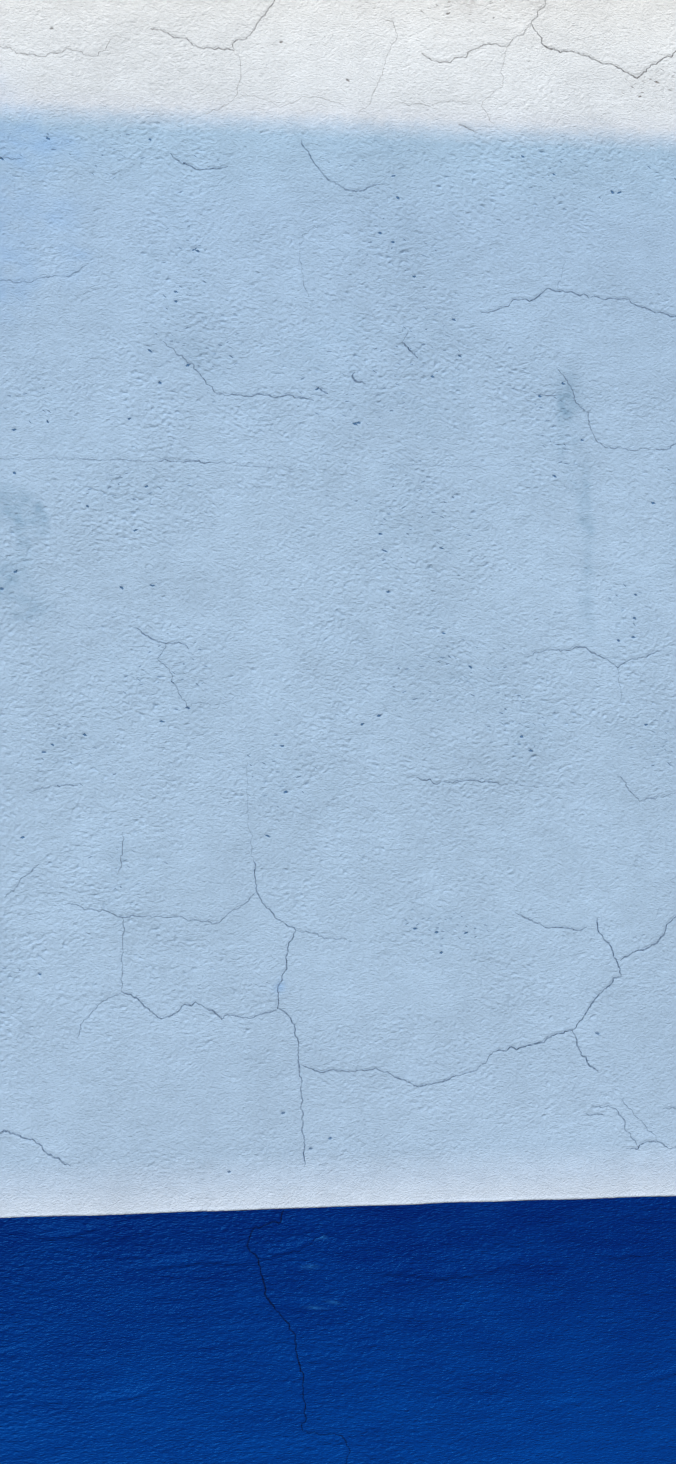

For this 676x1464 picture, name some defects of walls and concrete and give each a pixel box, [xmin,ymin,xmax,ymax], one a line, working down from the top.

crack [489,920,672,1066]